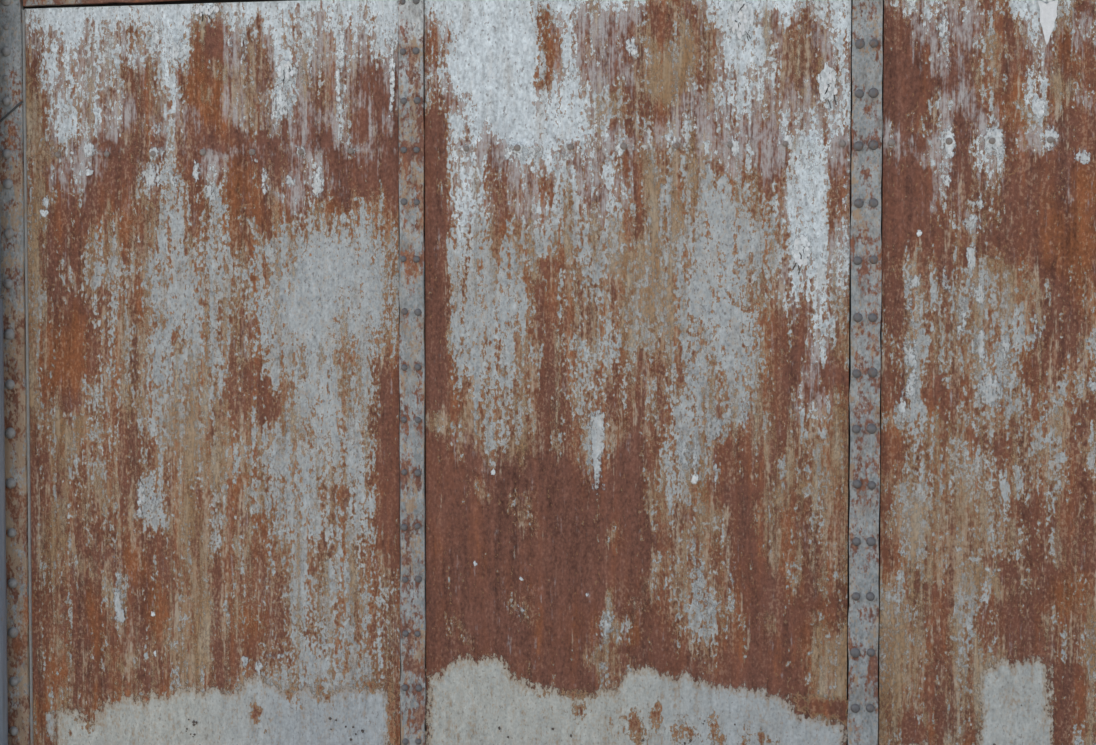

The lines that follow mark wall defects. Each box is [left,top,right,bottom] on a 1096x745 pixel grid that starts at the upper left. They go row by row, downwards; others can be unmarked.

peeling [193,4,219,22]
peeling [622,37,638,59]
peeling [1019,0,1058,44]
peeling [140,120,216,202]
peeling [312,167,324,198]
peeling [938,127,957,189]
peeling [980,122,1006,159]
peeling [1032,96,1059,151]
peeling [1074,148,1090,164]
corrosion [25,0,400,745]
corrosion [425,0,851,745]
corrosion [879,0,1096,745]